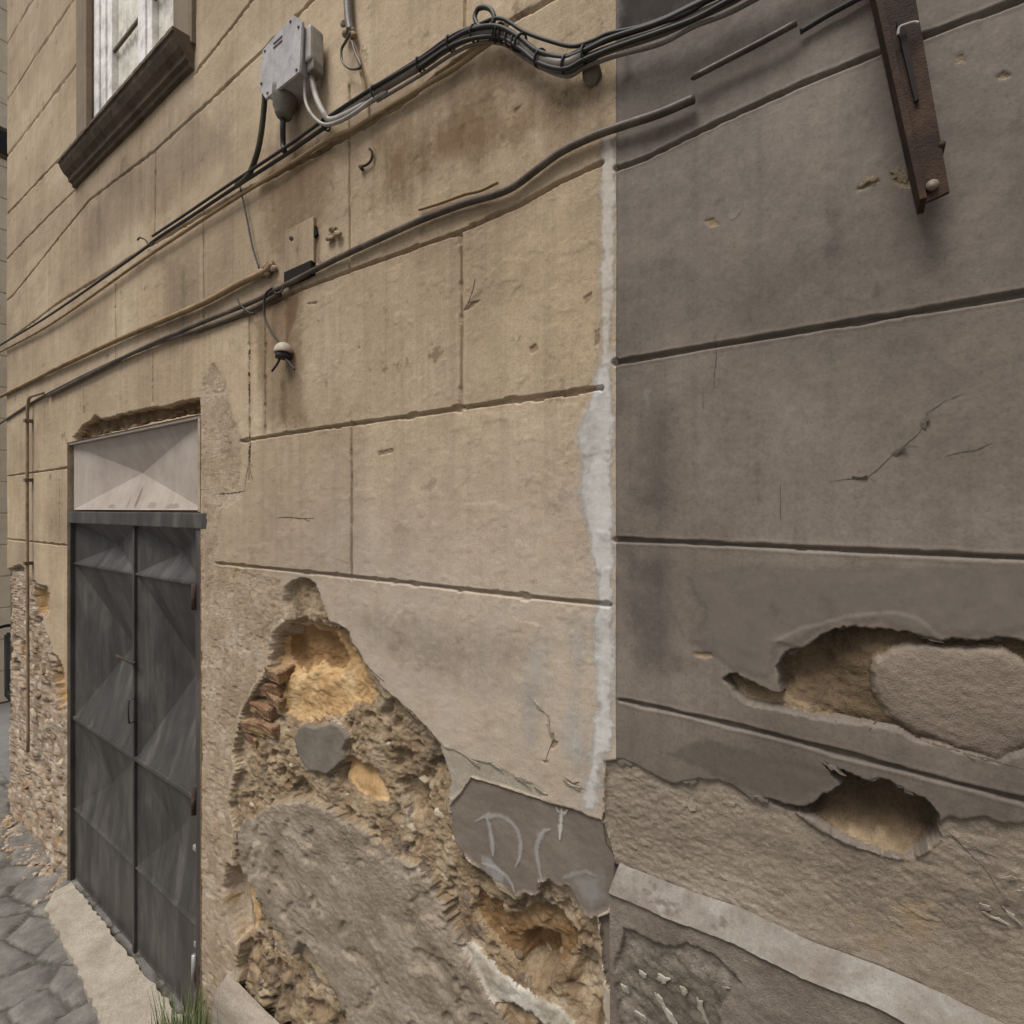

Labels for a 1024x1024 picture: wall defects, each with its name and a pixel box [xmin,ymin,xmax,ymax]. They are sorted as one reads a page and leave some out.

crack [832,393,963,482]
flaking render [8,565,67,878]
flaking render [78,363,740,1024]
crack [529,696,585,790]
flaking render [731,626,1024,757]
peeling [603,758,1024,1024]